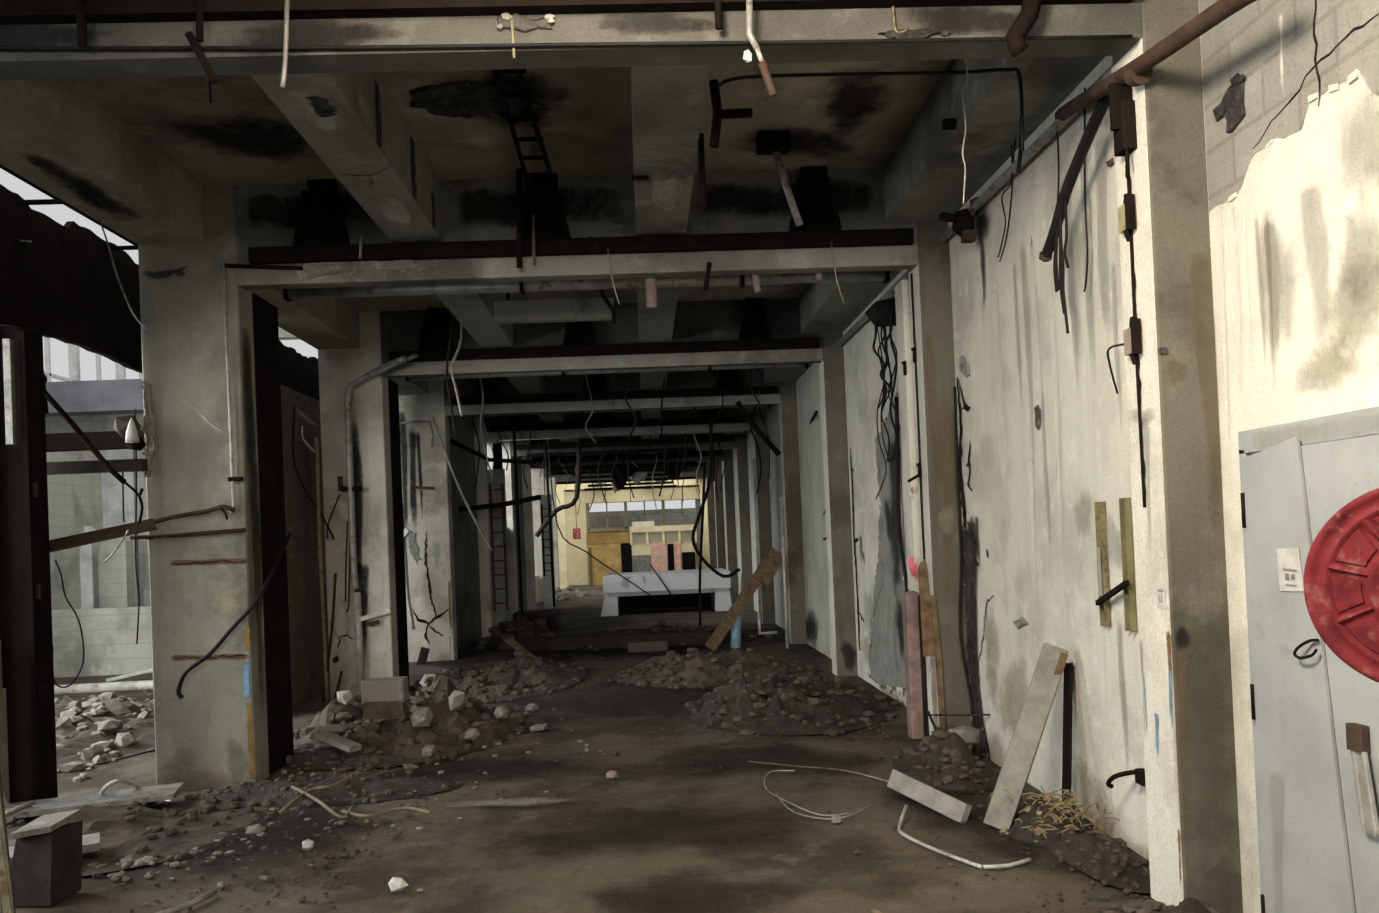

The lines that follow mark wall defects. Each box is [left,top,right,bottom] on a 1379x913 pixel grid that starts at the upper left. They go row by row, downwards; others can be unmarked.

peeling [1199,0,1379,211]
leakage [1308,265,1379,385]
corrosion [171,558,246,566]
crack [412,531,449,644]
peeling [868,391,906,695]